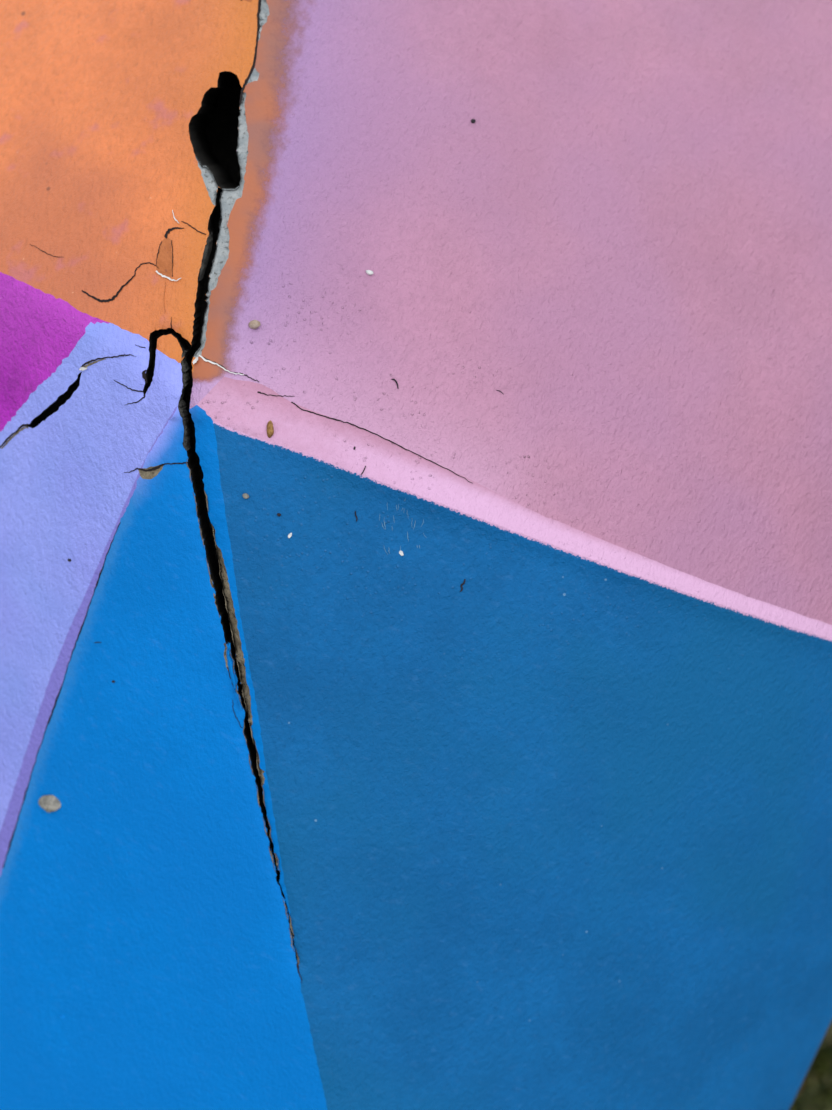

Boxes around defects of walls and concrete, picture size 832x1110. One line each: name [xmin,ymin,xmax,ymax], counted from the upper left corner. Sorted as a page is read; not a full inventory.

peeling [191,143,218,206]
crack [0,0,472,984]